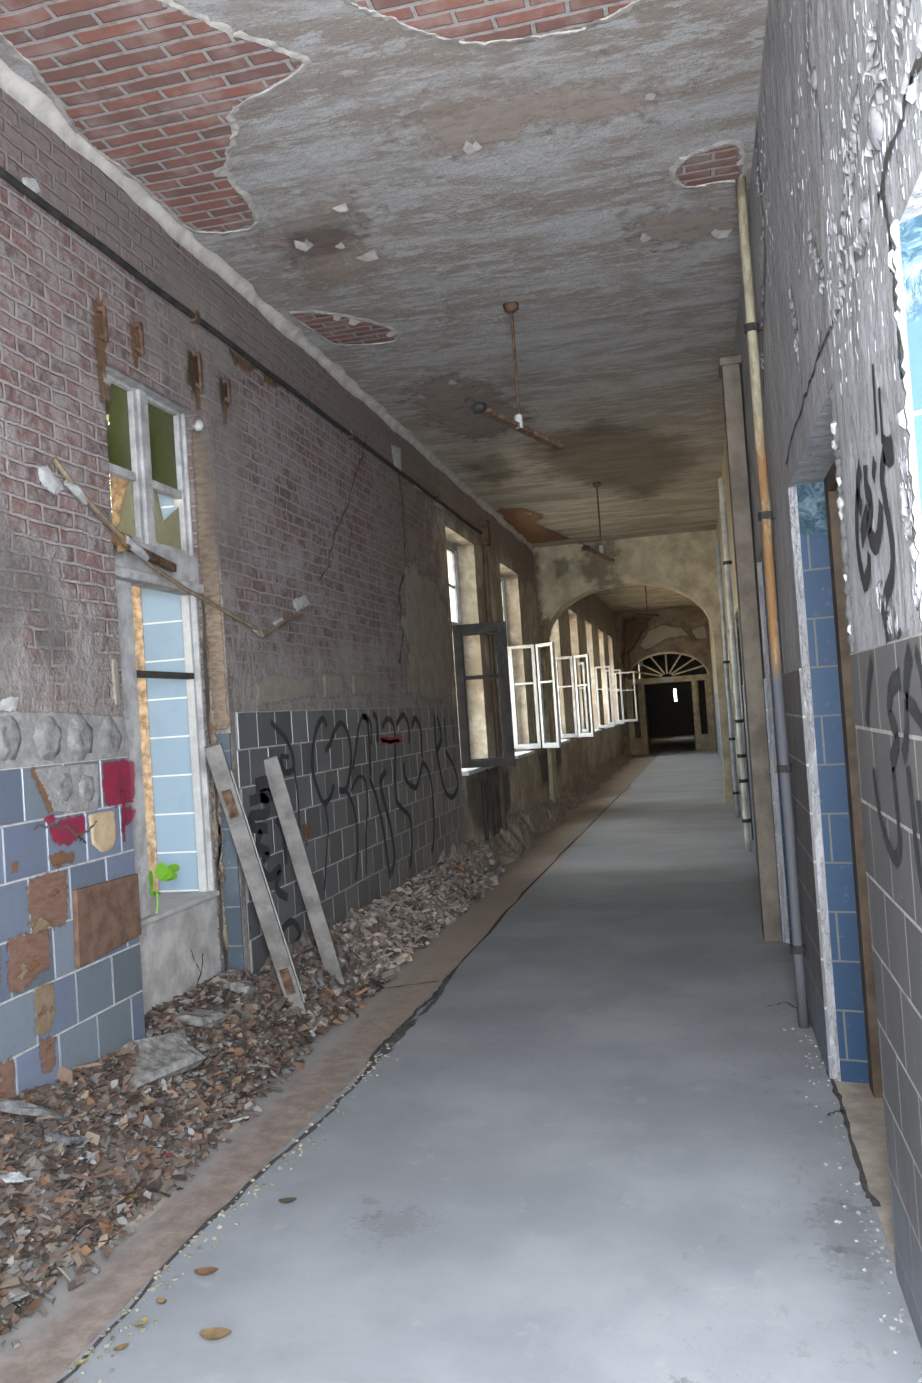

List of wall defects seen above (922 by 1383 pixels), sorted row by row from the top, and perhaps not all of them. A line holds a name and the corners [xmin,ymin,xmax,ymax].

spalling [340,0,646,48]
spalling [0,0,379,290]
crack [877,24,922,379]
spalling [289,310,402,346]
peeling [669,0,922,653]
peeling [497,508,569,543]
spalling [0,871,68,1073]
spalling [0,1057,16,1099]